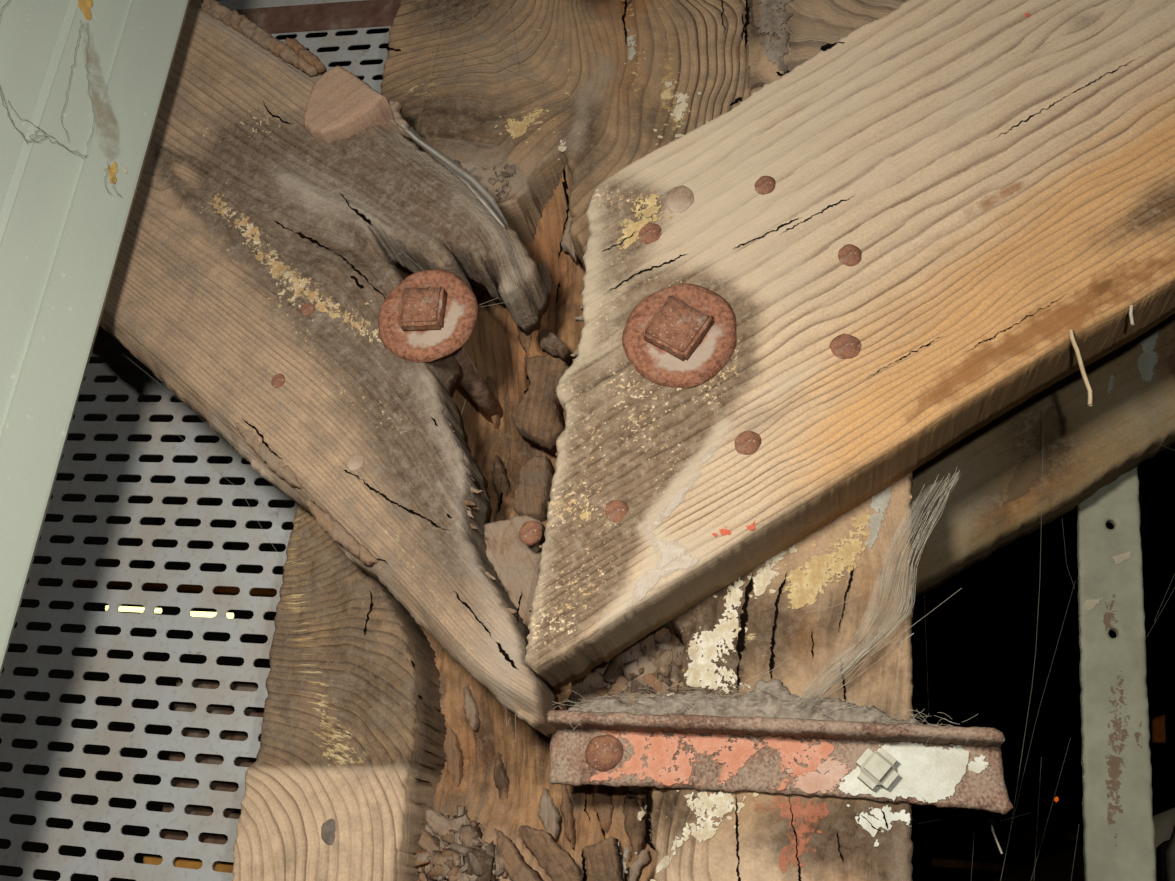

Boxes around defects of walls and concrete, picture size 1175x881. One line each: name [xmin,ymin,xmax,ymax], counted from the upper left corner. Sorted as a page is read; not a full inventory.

crack [555,168,569,303]
spalling [452,109,585,629]
water stain [930,281,1120,401]
crack [242,418,282,459]
crack [344,470,452,531]
crack [364,589,373,635]
crack [454,590,523,669]
spalling [547,485,893,710]
spalling [414,626,989,881]
crack [734,796,742,881]
crack [789,796,801,881]